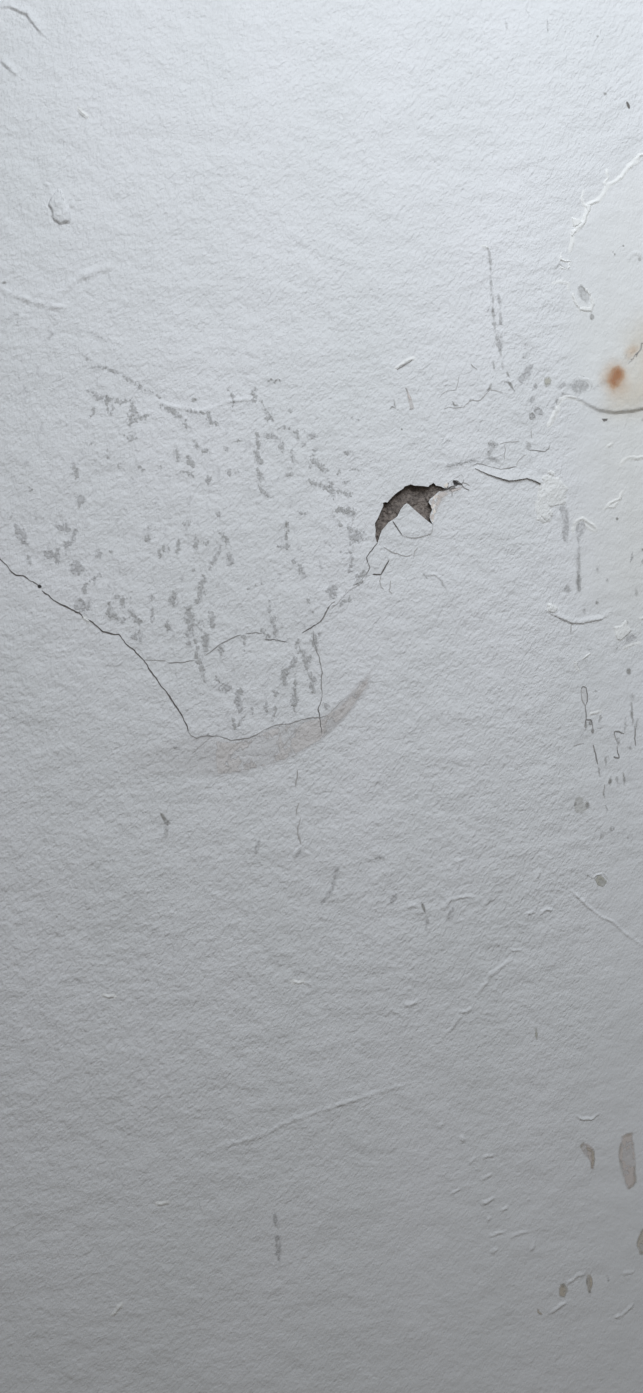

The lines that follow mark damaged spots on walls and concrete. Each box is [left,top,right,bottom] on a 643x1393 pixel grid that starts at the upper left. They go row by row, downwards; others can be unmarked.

peeling [88,366,218,484]
spalling [225,387,598,606]
corrosion [611,343,643,385]
crack [0,543,418,741]
peeling [106,512,330,729]